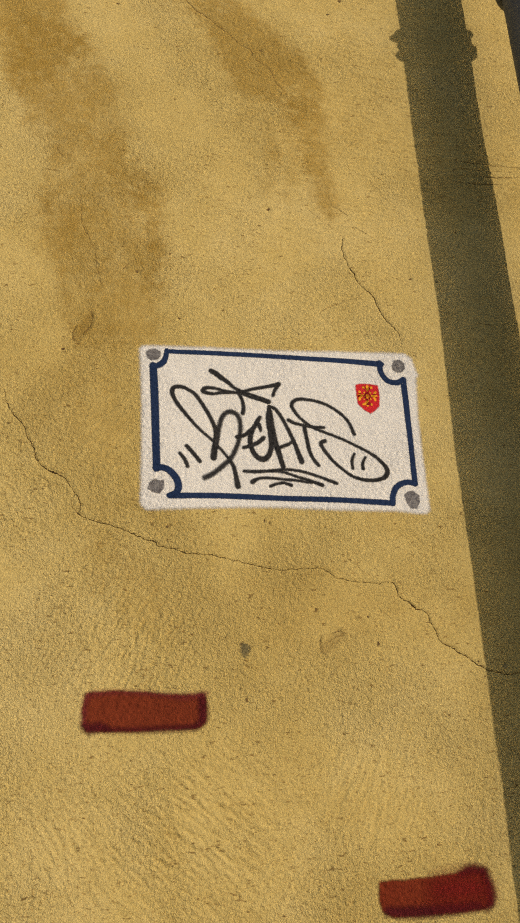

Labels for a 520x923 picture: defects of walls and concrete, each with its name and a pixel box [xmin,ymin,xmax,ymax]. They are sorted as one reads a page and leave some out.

crack [317,207,401,340]
crack [1,356,520,675]